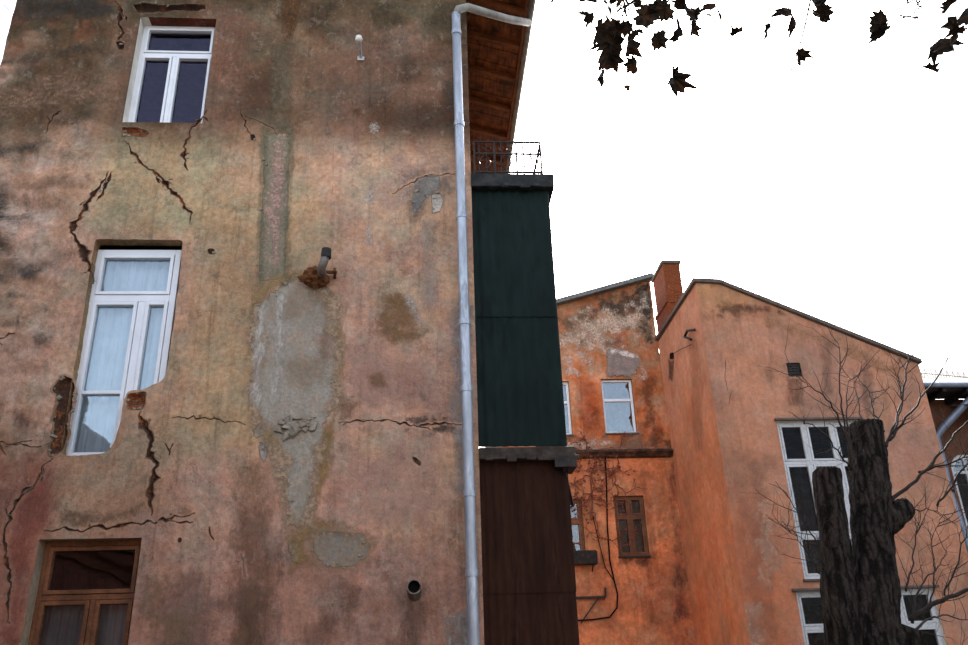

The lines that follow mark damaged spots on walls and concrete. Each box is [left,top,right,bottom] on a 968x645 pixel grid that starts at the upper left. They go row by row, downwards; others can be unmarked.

crack [114,0,128,42]
crack [124,110,209,223]
crack [68,171,113,284]
flaking render [560,296,647,380]
flaking render [47,374,78,458]
crack [44,410,246,540]
flaking render [249,272,346,562]
crack [339,419,462,430]
crack [0,440,53,624]